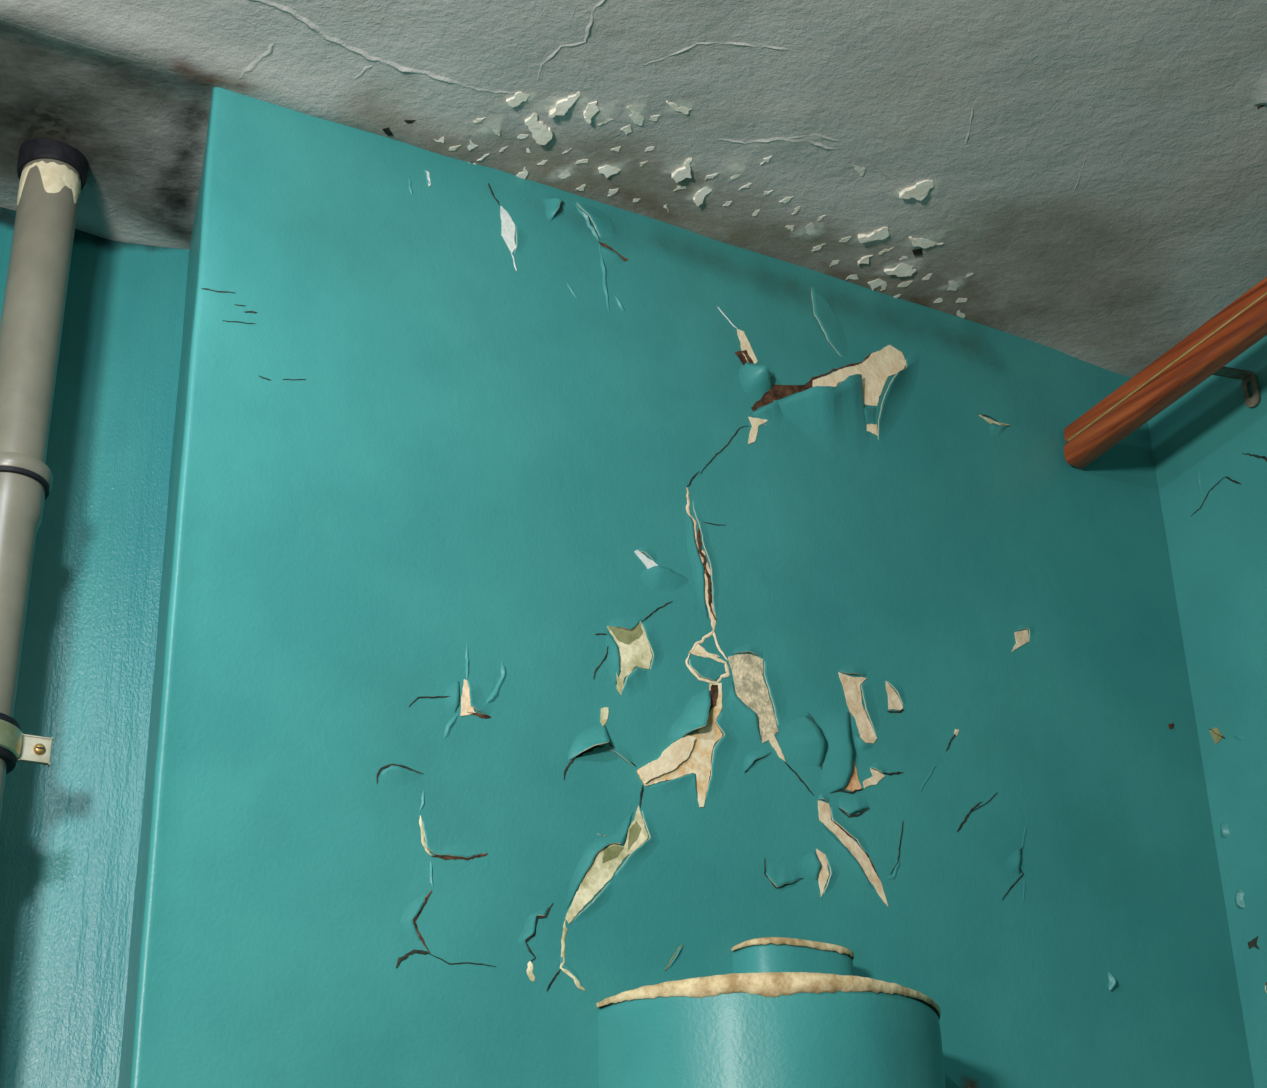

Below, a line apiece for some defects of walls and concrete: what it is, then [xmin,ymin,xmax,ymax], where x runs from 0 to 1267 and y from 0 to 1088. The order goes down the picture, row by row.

damp [0,207,16,226]
damp [0,26,161,179]
damp [161,150,190,212]
peeling [434,92,695,196]
peeling [839,227,944,298]
peeling [700,307,920,474]
crack [409,643,507,739]
peeling [593,546,689,697]
crack [683,472,721,631]
peeling [564,631,906,923]
crack [376,764,496,968]
crack [517,903,585,991]